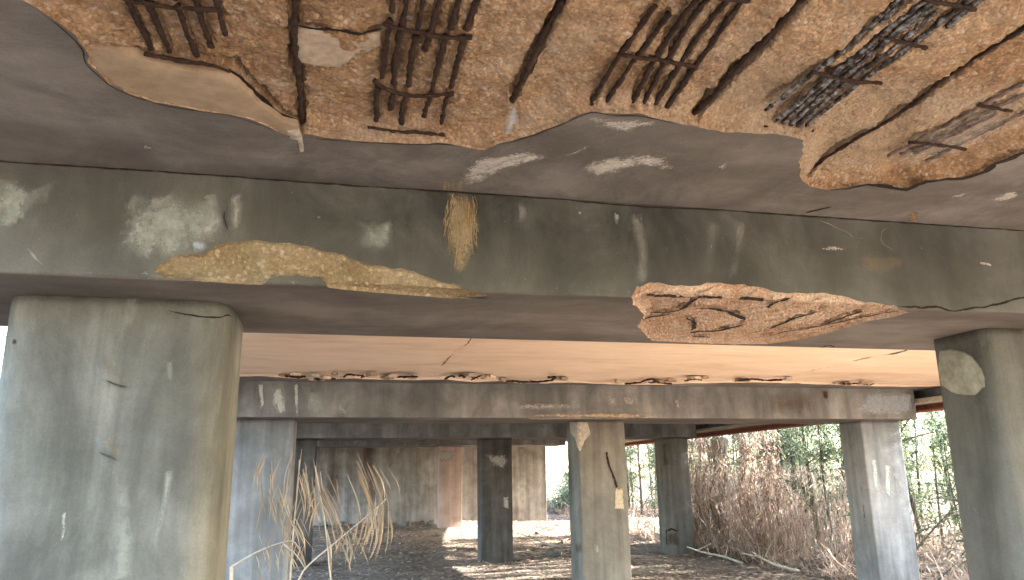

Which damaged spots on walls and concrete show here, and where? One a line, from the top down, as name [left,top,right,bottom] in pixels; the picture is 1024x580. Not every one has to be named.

spalling [23,0,1024,190]
leakage [464,152,542,184]
leakage [584,155,672,175]
leakage [0,186,27,223]
leakage [129,202,215,252]
spalling [154,240,486,298]
crack [168,310,231,318]
crack [900,297,1024,312]
spalling [240,282,940,387]